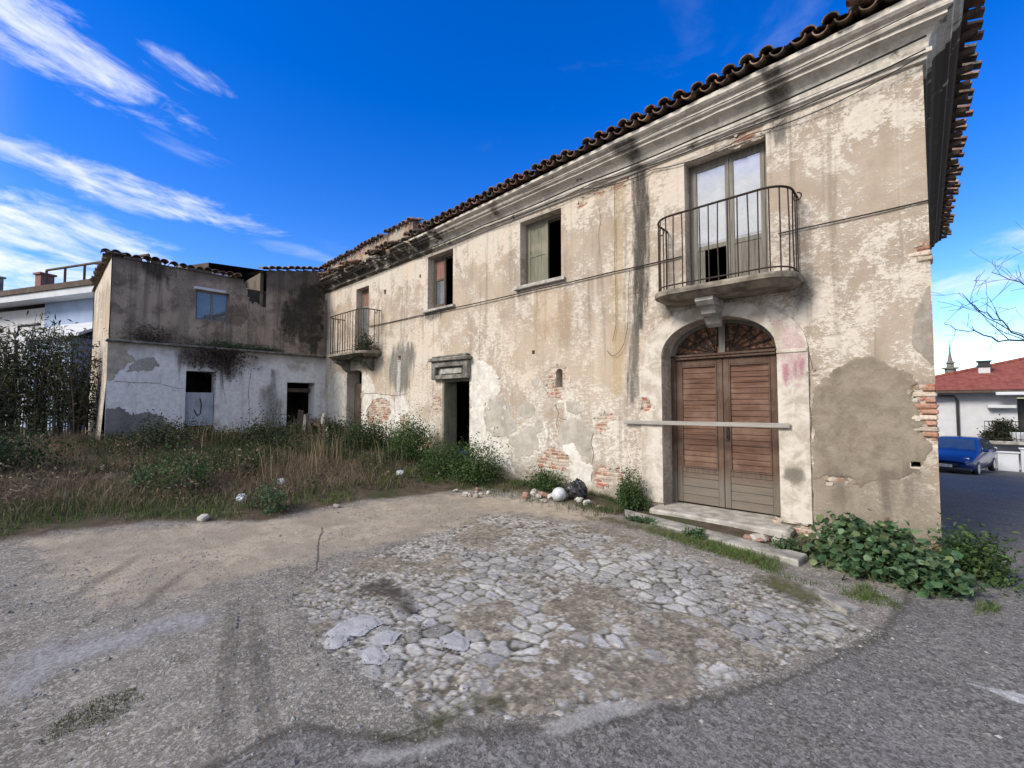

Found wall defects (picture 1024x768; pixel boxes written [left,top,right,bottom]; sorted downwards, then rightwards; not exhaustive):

water stain [614,138,650,401]
spalling [908,242,933,265]
water stain [281,284,328,355]
peeling [361,370,441,450]
water stain [389,344,414,396]
peeling [469,358,515,475]
spalling [544,364,566,406]
spalling [593,410,616,434]
spalling [907,384,940,444]
peeling [536,443,623,490]